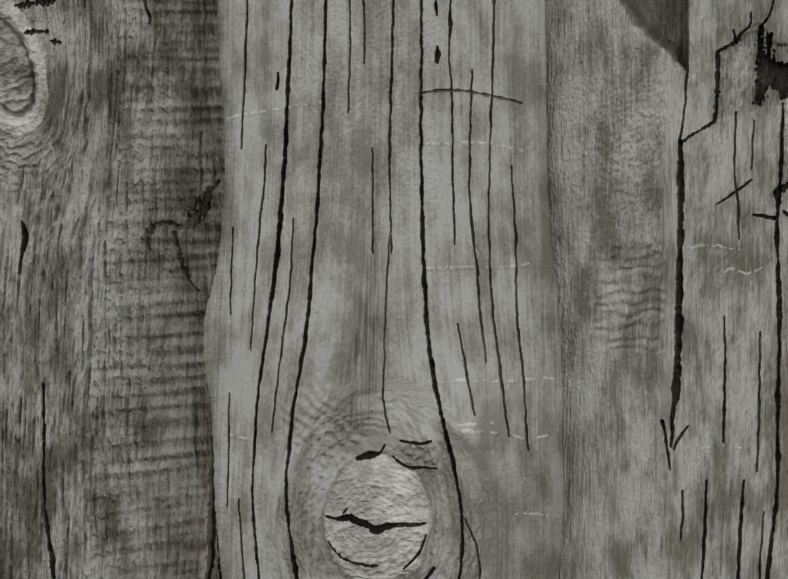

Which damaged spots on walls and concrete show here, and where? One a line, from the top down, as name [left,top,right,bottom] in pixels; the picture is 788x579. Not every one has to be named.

crack [205,0,328,579]
crack [347,0,366,113]
crack [325,508,436,579]
crack [355,0,530,579]
crack [660,0,788,579]